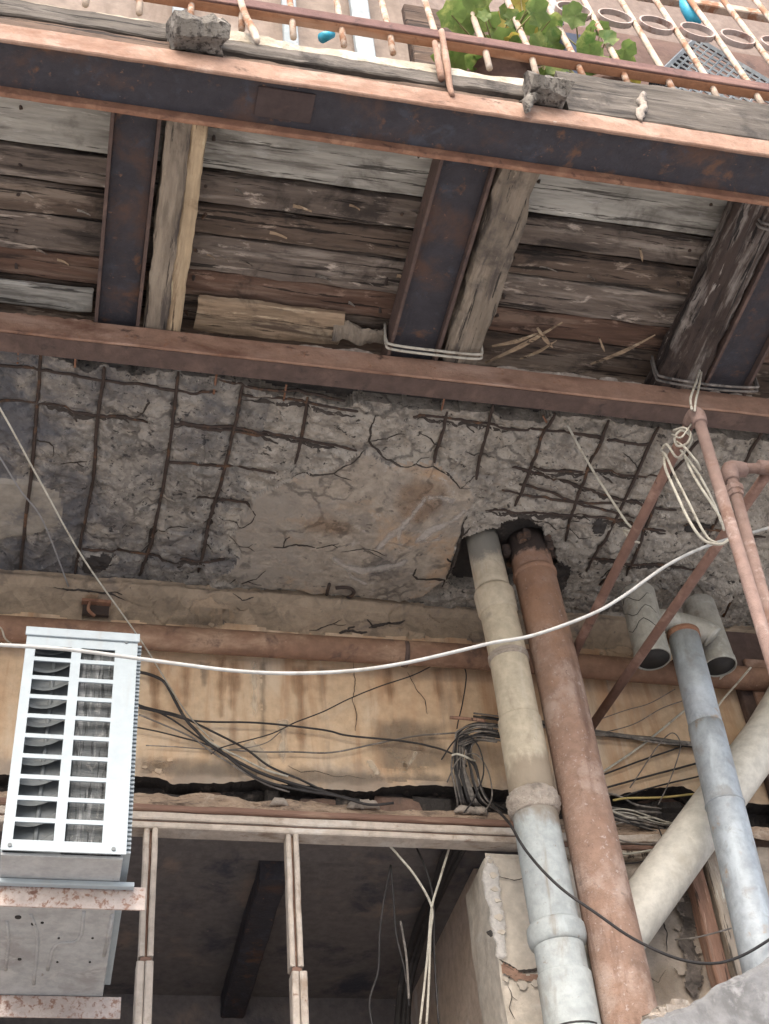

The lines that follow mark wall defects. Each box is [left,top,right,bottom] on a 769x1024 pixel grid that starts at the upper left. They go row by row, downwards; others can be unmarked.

spalling [0,351,769,628]
rust [501,528,556,567]
crack [53,587,124,600]
crack [309,619,405,634]
water stain [312,723,438,782]
flaking render [483,857,538,991]